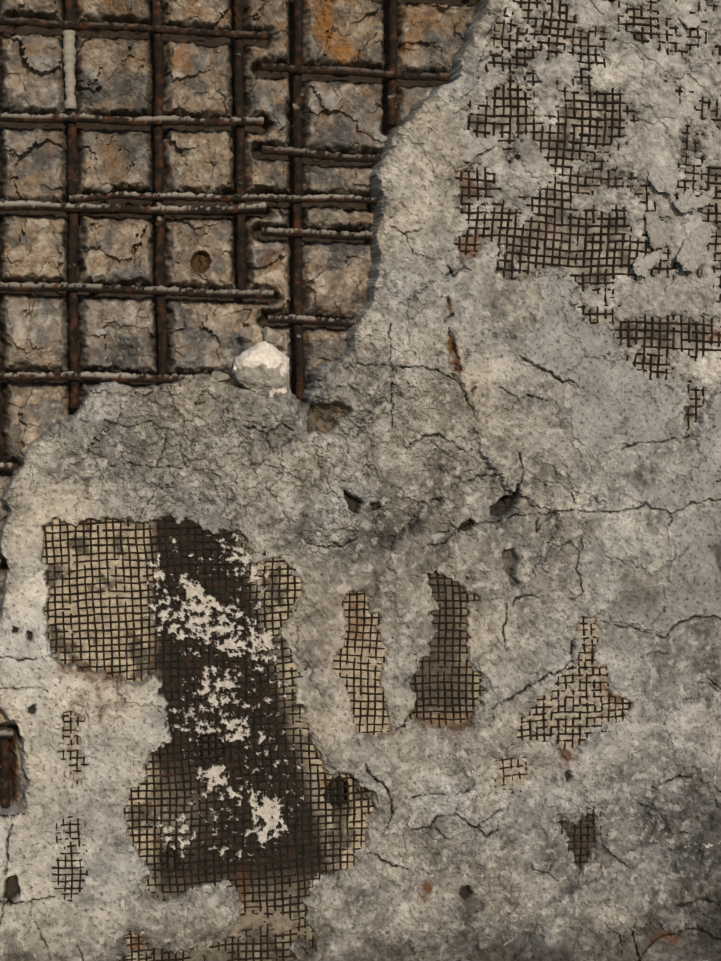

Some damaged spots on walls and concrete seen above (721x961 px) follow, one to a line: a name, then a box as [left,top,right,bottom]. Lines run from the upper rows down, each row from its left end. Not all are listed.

crack [357,229,476,426]
rust [448,336,461,372]
crack [502,358,574,401]
spalling [452,0,721,793]
crack [431,481,720,599]
spalling [41,515,379,961]
spalling [332,590,395,739]
spalling [407,571,488,731]
crack [502,594,538,643]
crack [492,660,572,709]
crack [365,764,499,839]
spalling [555,806,608,877]